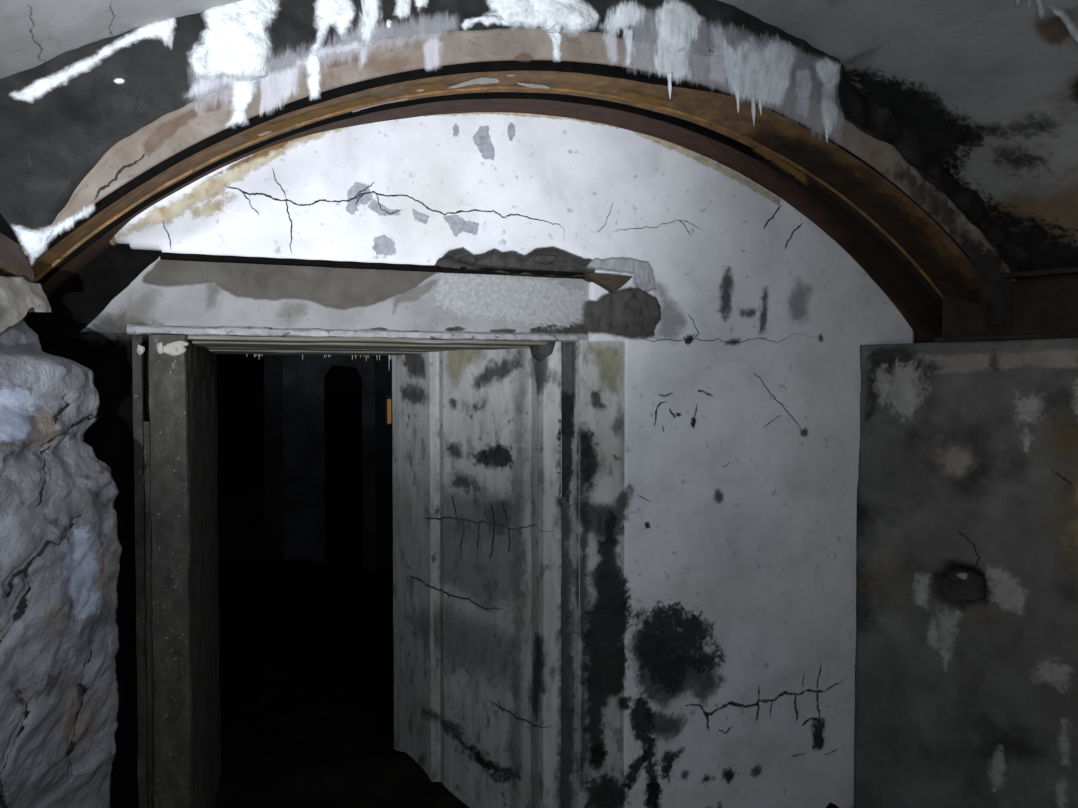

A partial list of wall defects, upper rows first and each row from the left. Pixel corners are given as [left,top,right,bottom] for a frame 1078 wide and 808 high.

water stain [11,18,175,102]
water stain [144,0,428,153]
water stain [462,0,701,98]
spalling [473,126,494,160]
spalling [346,182,400,216]
spalling [373,235,396,255]
crack [224,169,564,252]
spalling [435,215,596,277]
crack [595,206,702,236]
water stain [143,260,589,328]
crack [423,495,552,557]
crack [685,665,842,757]